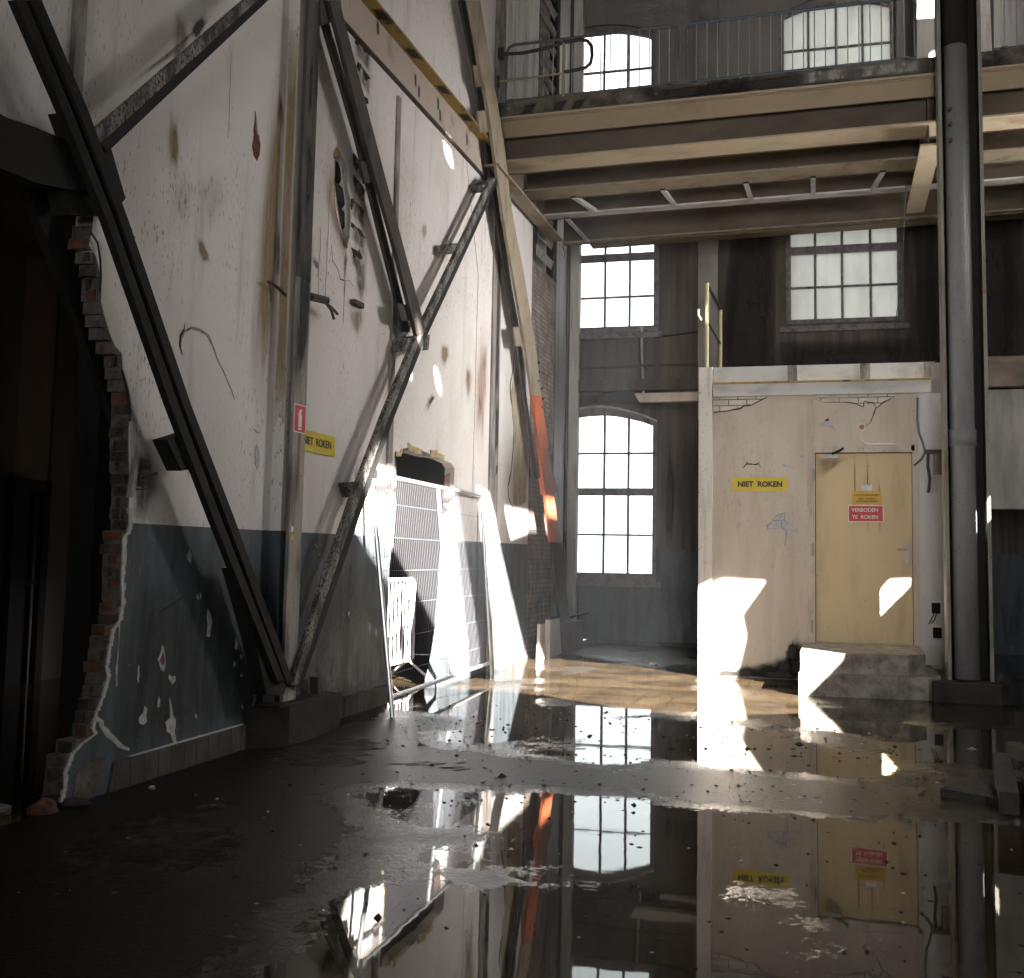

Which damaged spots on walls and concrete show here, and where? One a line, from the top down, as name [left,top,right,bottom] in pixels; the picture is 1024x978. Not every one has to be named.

crack [179,324,235,400]
spalling [713,397,767,413]
peeling [157,645,176,684]
peeling [139,697,176,743]